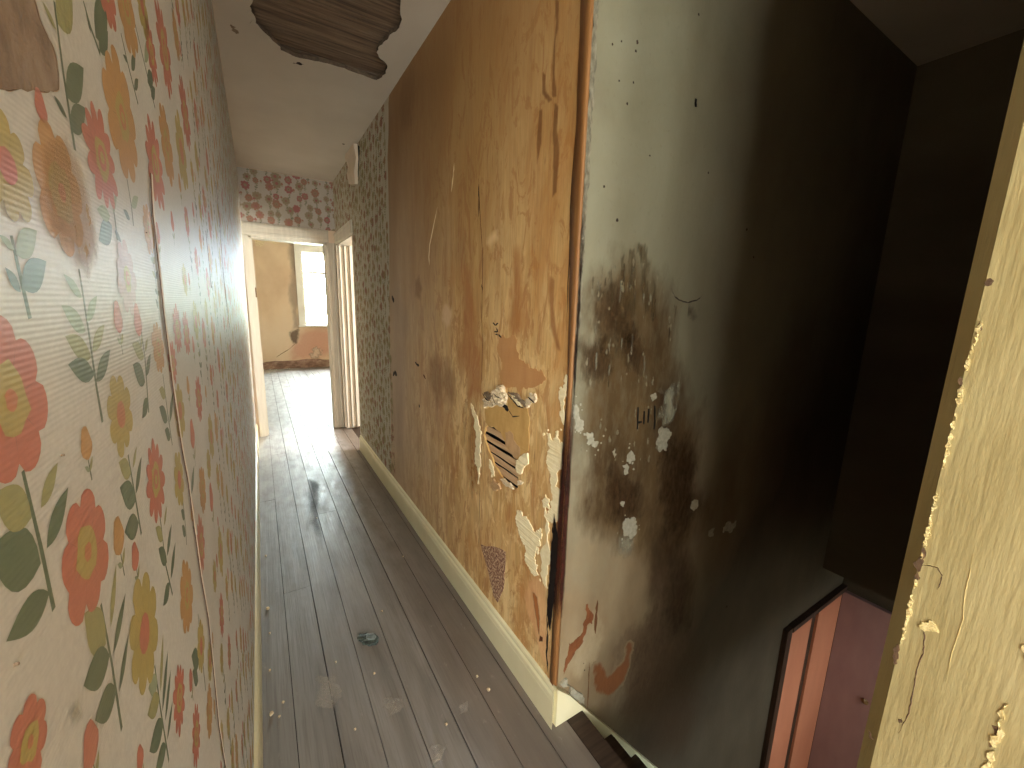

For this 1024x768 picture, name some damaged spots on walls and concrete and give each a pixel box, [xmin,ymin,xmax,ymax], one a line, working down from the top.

flaking render [247,0,401,76]
flaking render [471,335,546,491]
peeling [515,374,604,589]
spalling [612,443,635,475]
spalling [617,501,640,551]
water stain [554,224,719,768]
spalling [656,426,672,452]
peeling [942,321,983,469]
peeling [892,493,943,731]
rust [591,639,634,699]
peeling [981,704,1008,768]